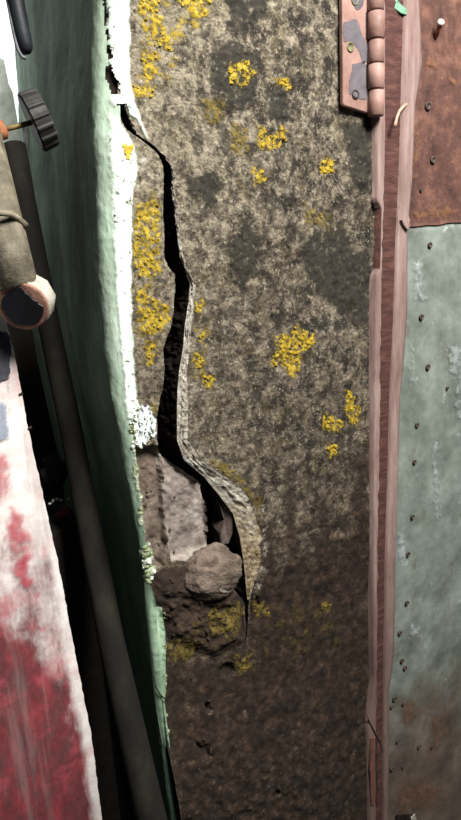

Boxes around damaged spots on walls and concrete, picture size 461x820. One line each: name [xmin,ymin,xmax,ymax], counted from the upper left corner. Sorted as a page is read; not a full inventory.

leakage [132,404,157,449]
crack [102,0,266,641]